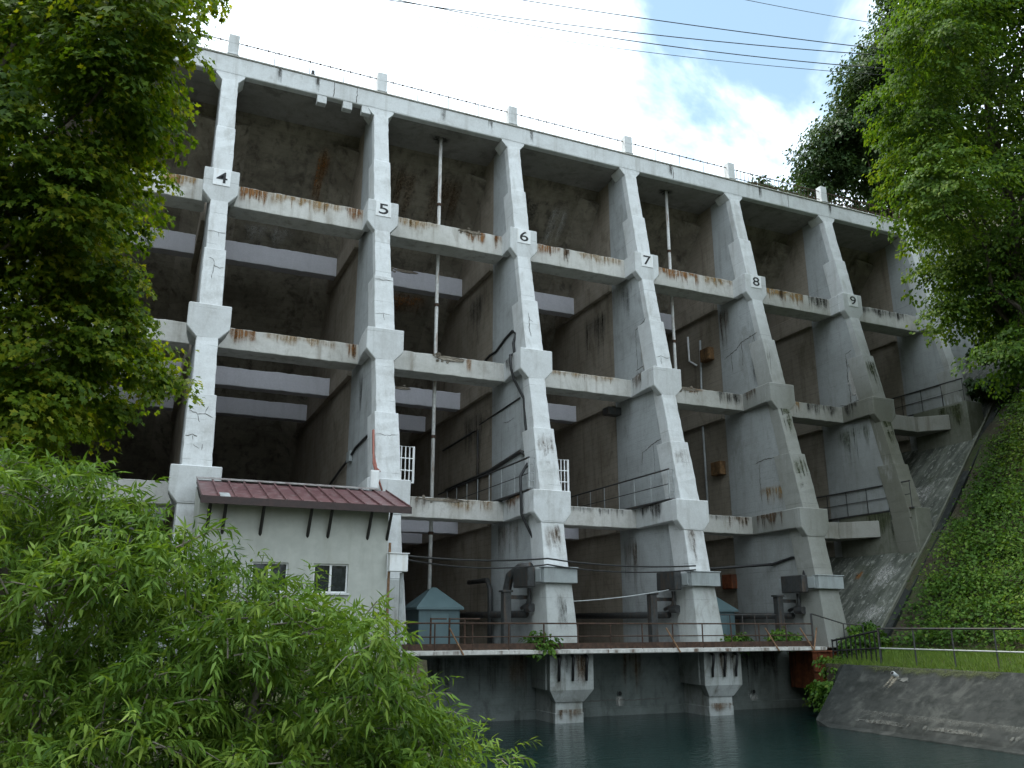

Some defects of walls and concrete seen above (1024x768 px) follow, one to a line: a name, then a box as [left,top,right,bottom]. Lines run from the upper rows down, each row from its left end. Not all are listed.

corrosion [240,157,363,219]
corrosion [658,267,722,285]
corrosion [230,328,255,341]